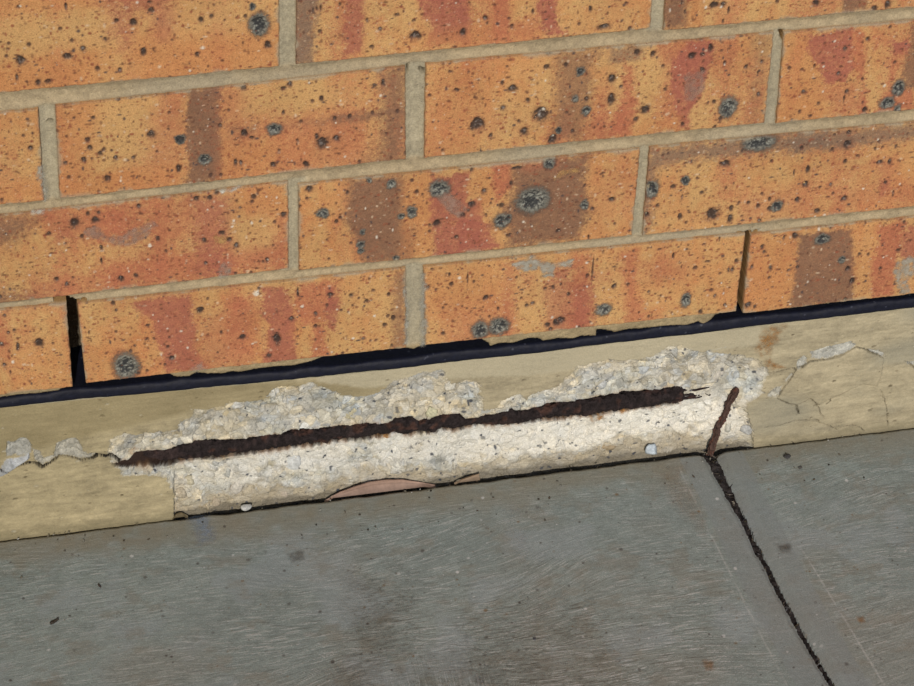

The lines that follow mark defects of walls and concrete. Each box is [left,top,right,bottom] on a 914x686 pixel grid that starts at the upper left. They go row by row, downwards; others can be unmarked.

spalling [108,344,770,521]
crack [765,341,914,431]